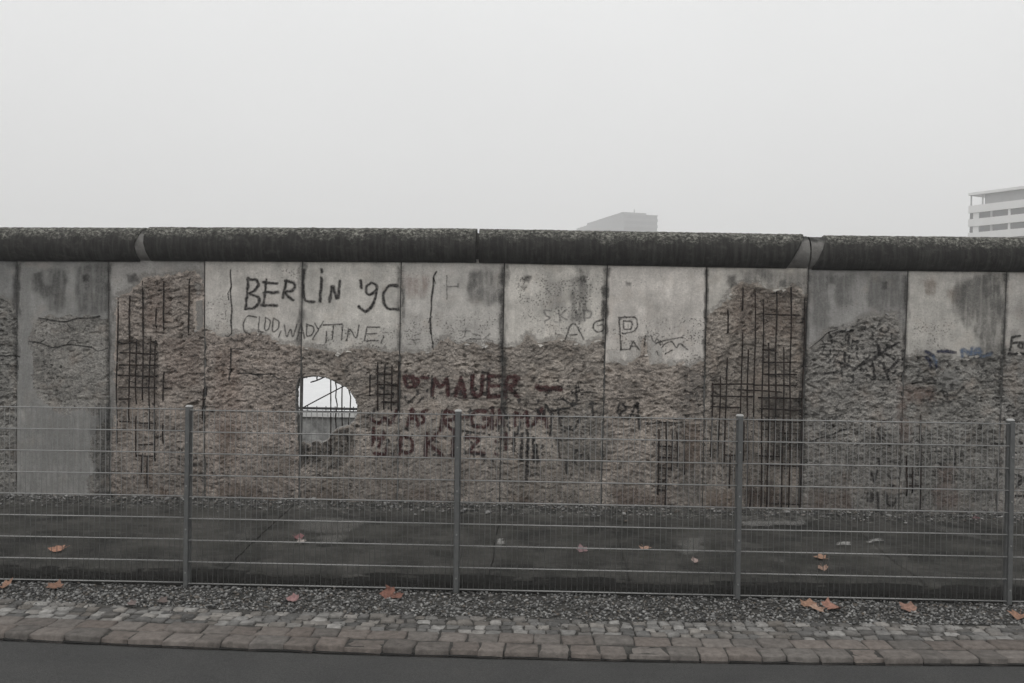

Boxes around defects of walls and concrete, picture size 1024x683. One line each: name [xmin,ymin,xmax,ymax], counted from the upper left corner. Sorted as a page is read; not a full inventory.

crack [0,315,107,369]
spalling [0,270,1024,515]